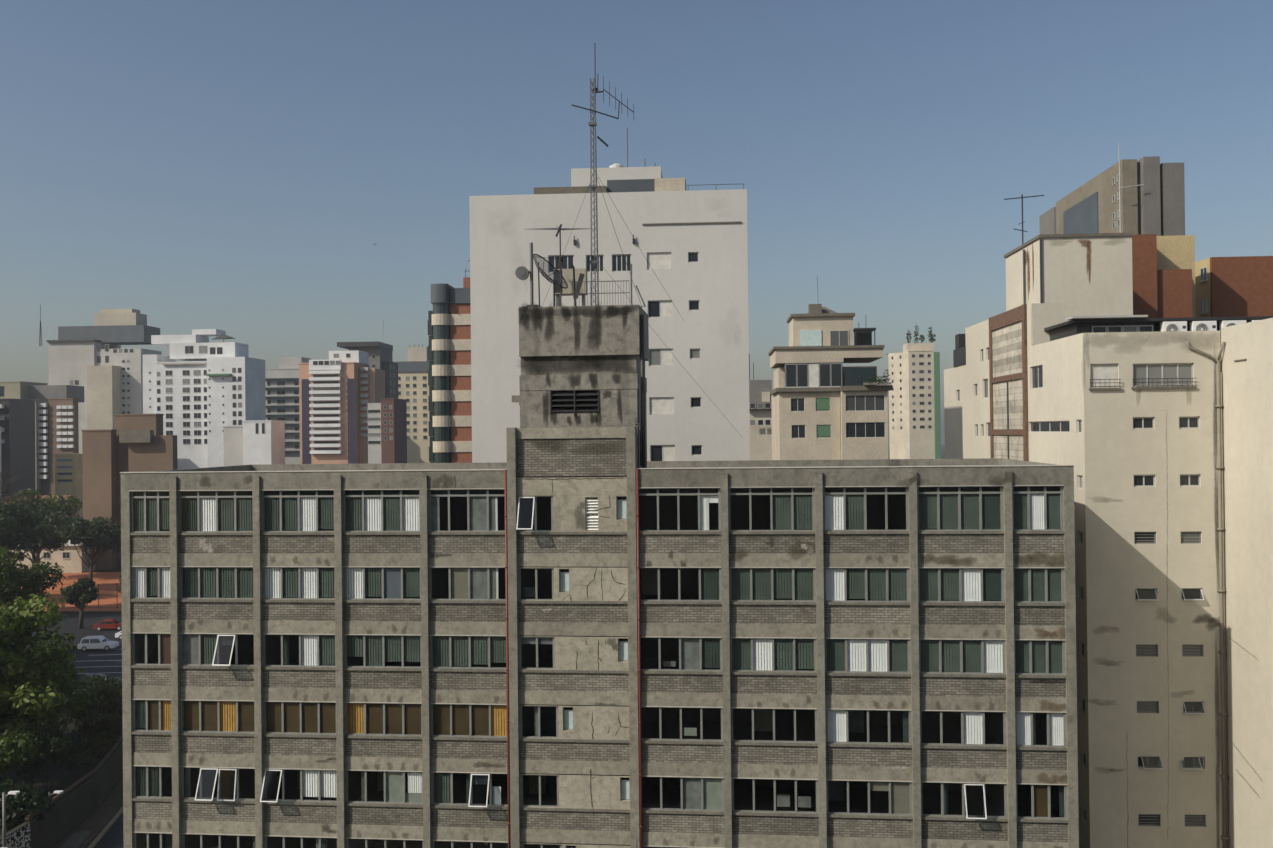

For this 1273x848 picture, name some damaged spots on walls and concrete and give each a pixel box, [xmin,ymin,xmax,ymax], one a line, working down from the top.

leakage [519,306,634,424]